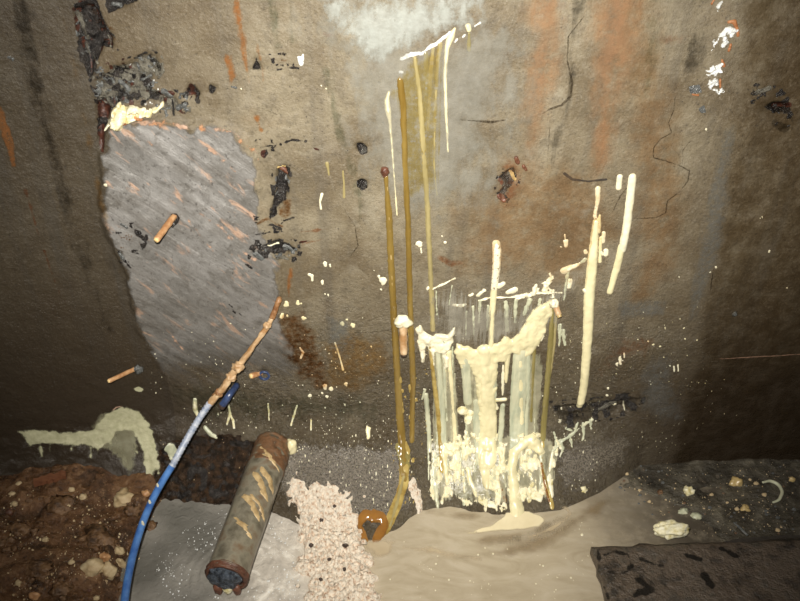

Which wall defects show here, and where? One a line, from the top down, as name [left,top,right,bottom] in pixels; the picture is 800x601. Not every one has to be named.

spalling [72,0,216,152]
water stain [706,19,740,95]
spalling [115,223,148,268]
spalling [245,165,307,269]
spalling [255,139,307,158]
water stain [384,71,416,443]
water stain [342,0,481,332]